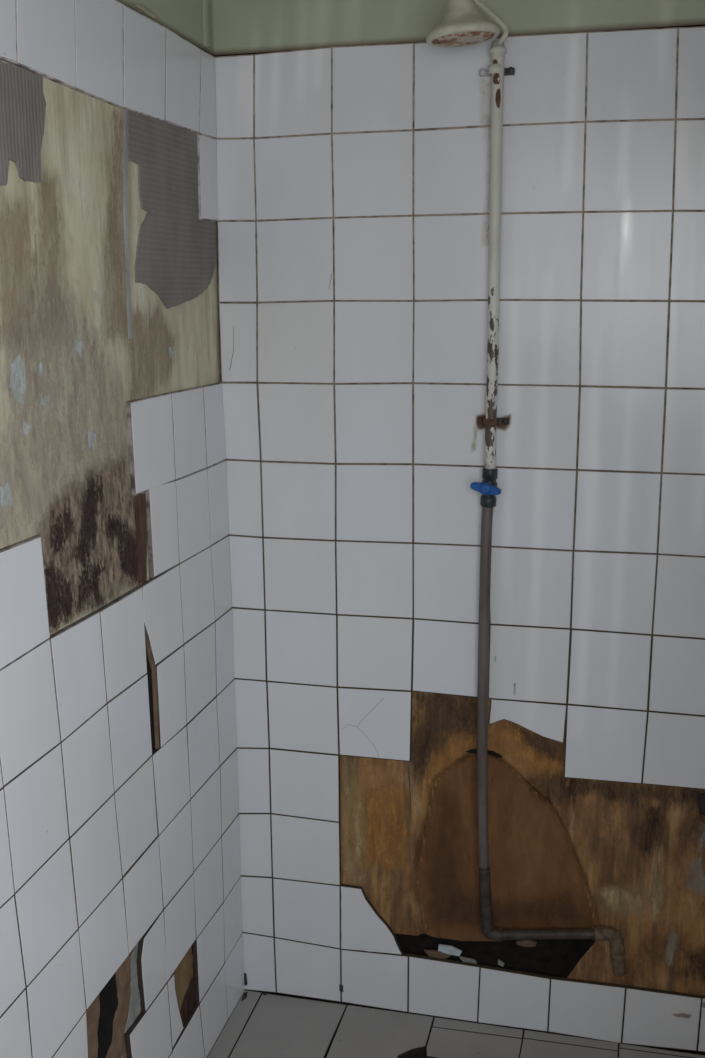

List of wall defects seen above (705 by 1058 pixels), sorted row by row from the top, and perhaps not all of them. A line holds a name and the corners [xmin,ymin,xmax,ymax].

corrosion [493,59,501,108]
peeling [0,60,221,635]
corrosion [473,415,510,449]
spalling [145,636,159,749]
spalling [340,691,705,995]
spalling [86,943,141,1058]
spalling [174,946,196,1023]